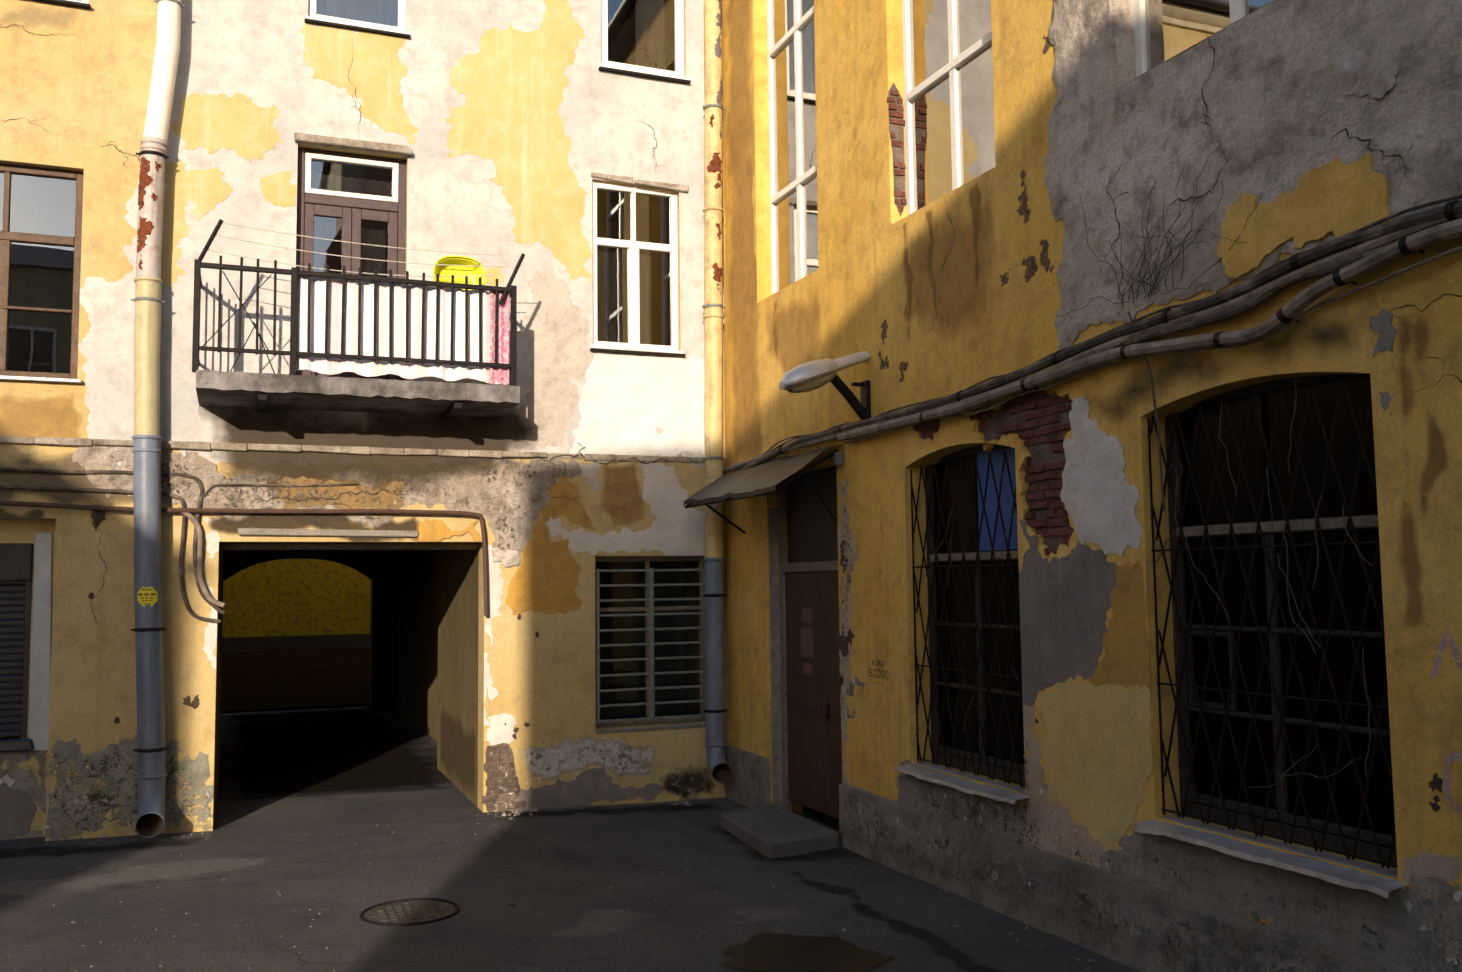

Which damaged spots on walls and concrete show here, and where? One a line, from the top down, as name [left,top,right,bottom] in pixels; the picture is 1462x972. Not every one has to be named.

flaking render [72,182,139,498]
corrosion [137,157,161,270]
flaking render [160,0,724,812]
flaking render [887,82,907,216]
water stain [904,187,987,332]
flaking render [974,387,1142,557]
flaking render [1000,0,1462,350]
water stain [1402,420,1445,622]
crack [1389,294,1462,319]
flaking render [0,717,138,840]
flaking render [160,739,214,834]
flaking render [896,703,1462,972]